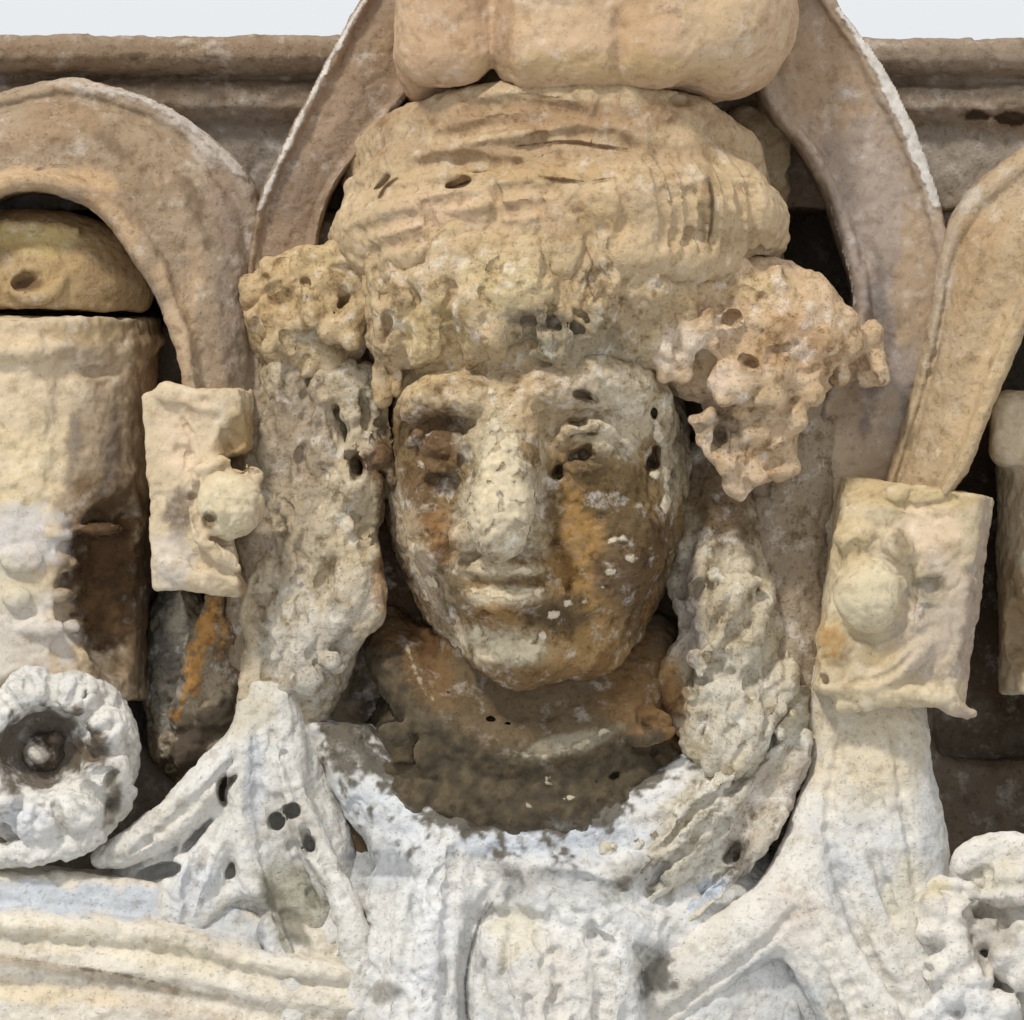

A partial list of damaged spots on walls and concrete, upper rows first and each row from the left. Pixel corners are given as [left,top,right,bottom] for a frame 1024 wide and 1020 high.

rust [563,485,594,590]
rust [169,600,228,722]
damp [363,642,677,830]